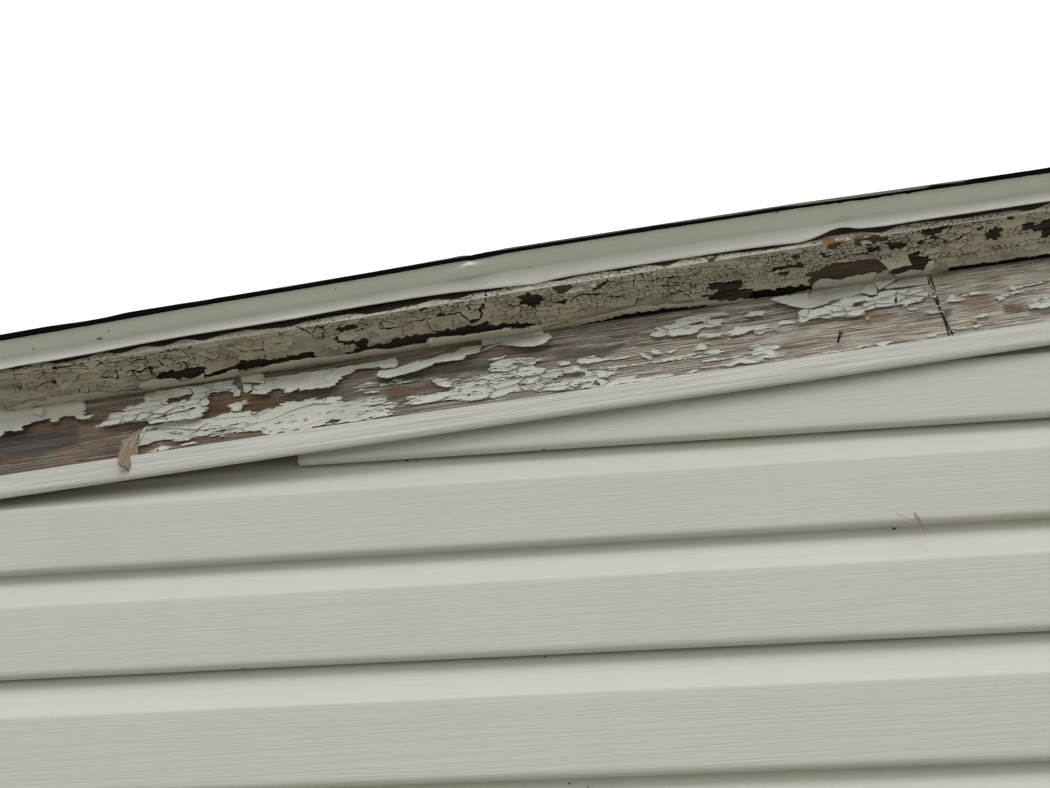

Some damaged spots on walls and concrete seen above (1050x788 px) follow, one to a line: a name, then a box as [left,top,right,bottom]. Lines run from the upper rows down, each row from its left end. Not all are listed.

peeling [977,216,1050,240]
crack [747,249,873,268]
crack [295,325,324,339]
crack [356,303,485,333]
peeling [0,225,1050,453]
crack [519,271,700,314]
crack [927,277,953,335]
crack [0,341,266,405]